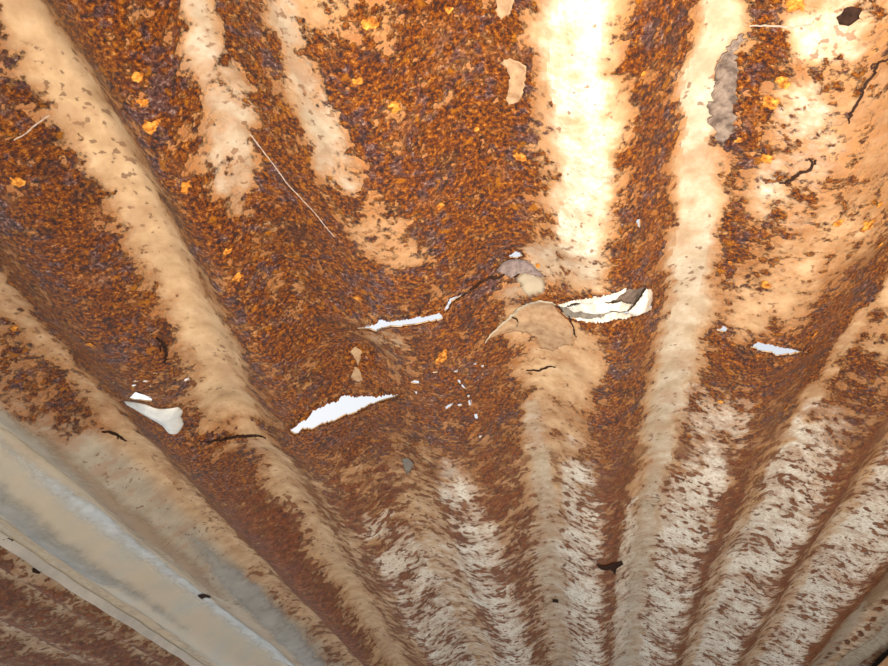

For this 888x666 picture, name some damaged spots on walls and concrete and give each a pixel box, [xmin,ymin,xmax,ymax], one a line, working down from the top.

peeling [707,33,747,146]
crack [847,59,888,124]
rust [0,0,706,666]
peeling [496,259,546,295]
rust [637,0,888,666]
crack [206,434,266,443]